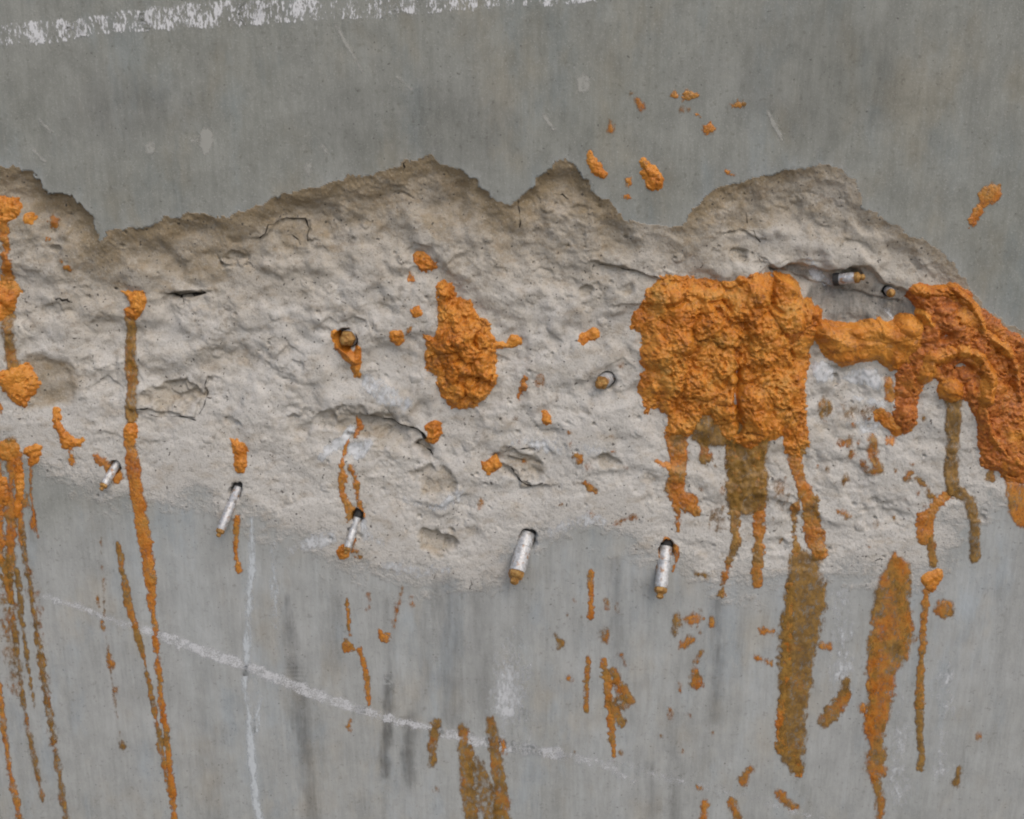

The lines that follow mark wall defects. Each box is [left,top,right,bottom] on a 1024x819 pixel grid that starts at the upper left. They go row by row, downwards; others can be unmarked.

crack [259,217,309,245]
rust [0,195,42,414]
spalling [0,153,1024,591]
rust [338,416,365,523]
rust [985,471,1024,528]
rust [0,437,68,819]
rust [92,290,178,819]
rust [587,569,616,620]
rust [754,398,981,819]
rust [427,718,441,767]
rust [457,717,510,819]
rust [567,653,635,761]